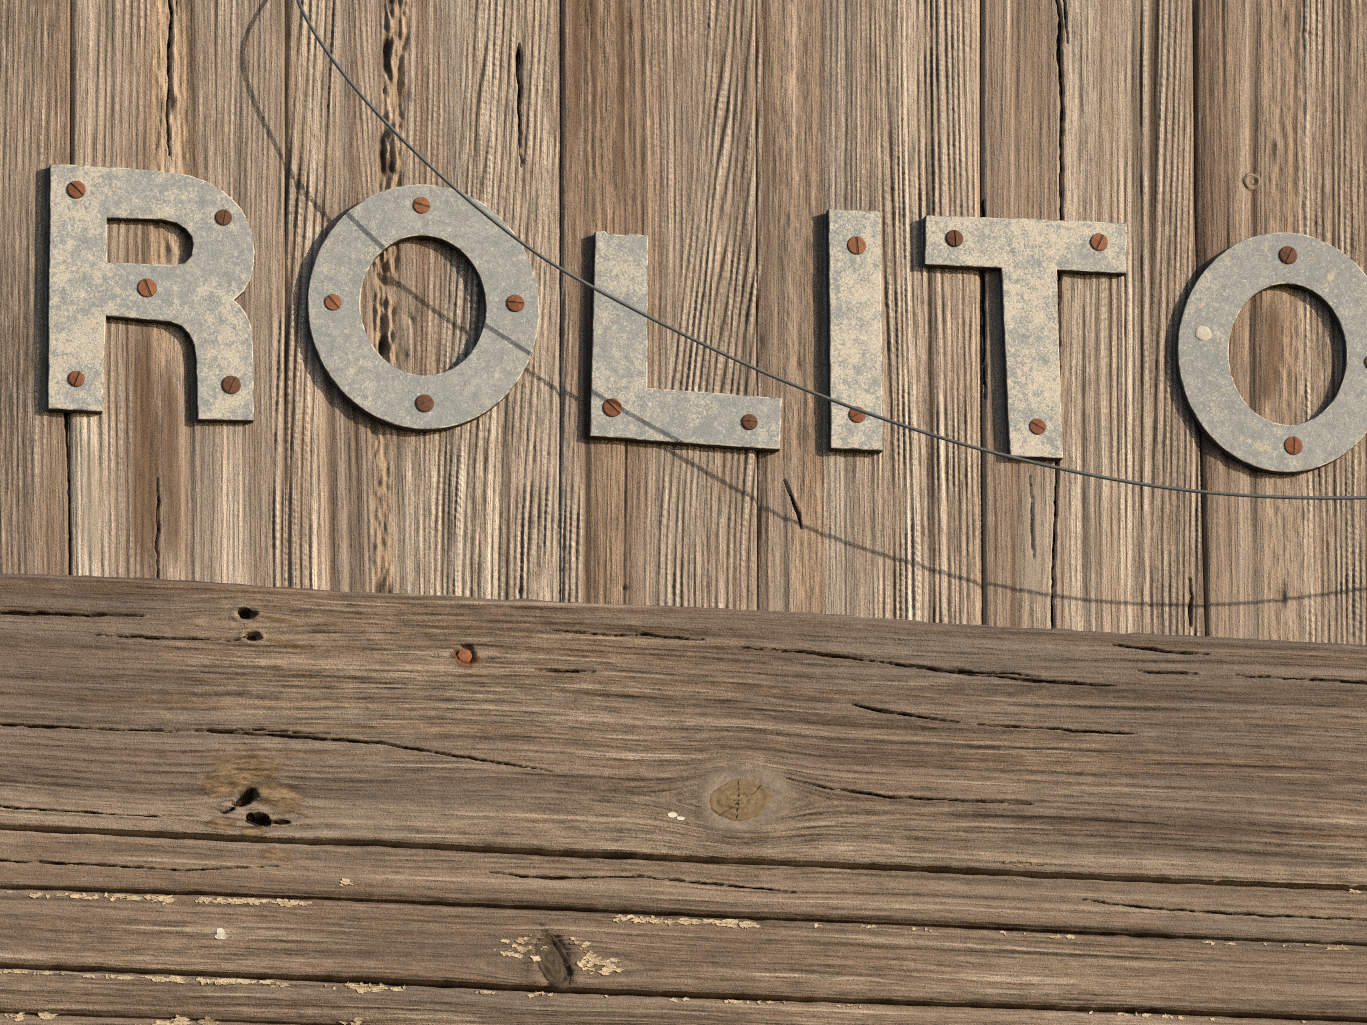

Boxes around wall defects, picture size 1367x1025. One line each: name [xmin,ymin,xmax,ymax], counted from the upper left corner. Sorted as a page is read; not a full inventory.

crack [165,0,173,156]
crack [514,50,522,145]
crack [1056,0,1066,220]
crack [788,491,801,526]
crack [1029,461,1057,628]
rust [451,649,481,667]
crack [1236,675,1367,685]
crack [0,724,536,769]
crack [977,724,1135,734]